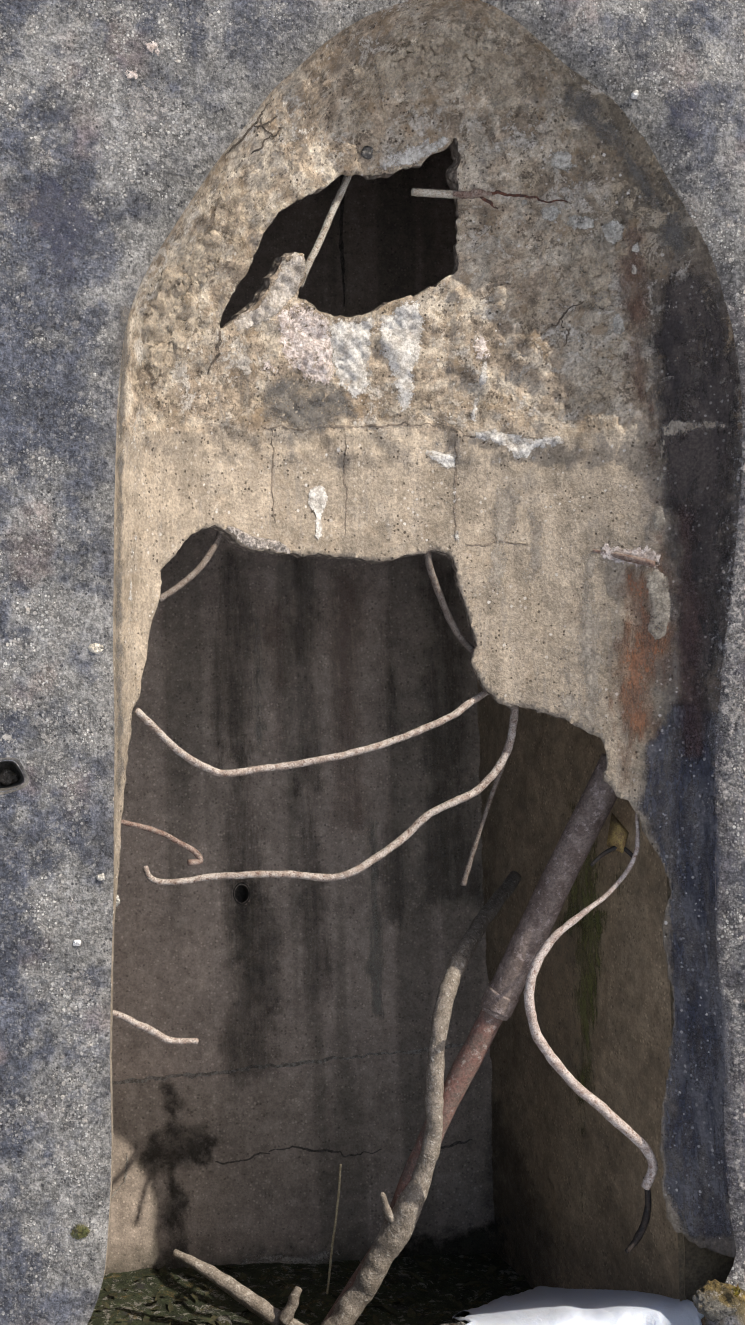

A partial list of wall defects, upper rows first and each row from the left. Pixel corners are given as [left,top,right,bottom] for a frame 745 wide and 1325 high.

crack [225,103,282,156]
spalling [234,255,305,331]
rust [620,232,643,322]
peeling [426,450,456,469]
spalling [227,526,291,554]
peeling [600,543,672,641]
rust [609,568,672,748]
damp [428,672,479,900]
damp [638,272,739,1237]
damp [559,842,607,1105]
damp [138,1084,217,1270]
crack [215,1139,473,1165]